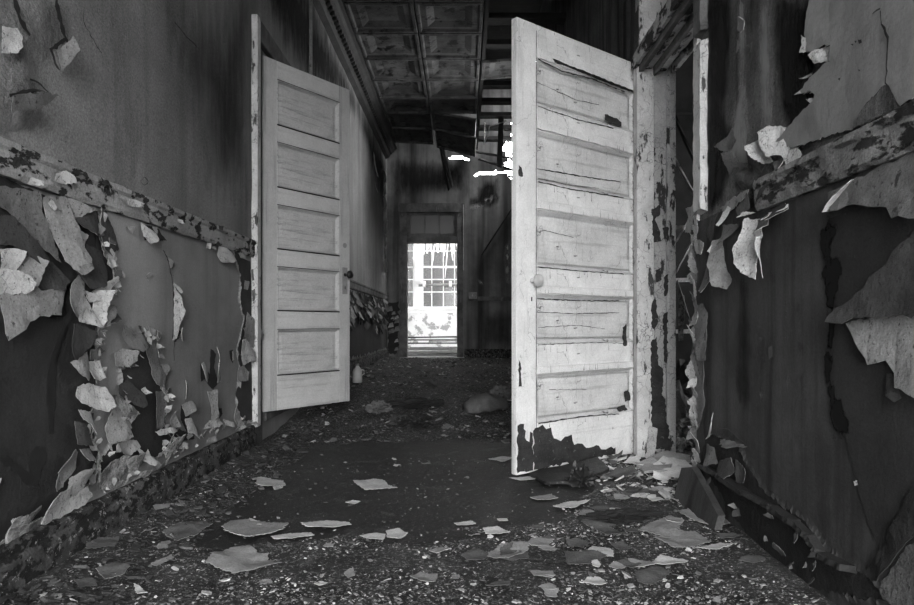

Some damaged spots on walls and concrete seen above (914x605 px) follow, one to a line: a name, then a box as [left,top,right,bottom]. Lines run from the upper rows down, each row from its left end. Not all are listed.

peeling [652,204,669,242]
peeling [0,170,264,545]
peeling [350,290,400,359]
peeling [628,268,670,478]
peeling [685,0,914,605]
peeling [511,424,616,481]
peeling [86,536,119,549]